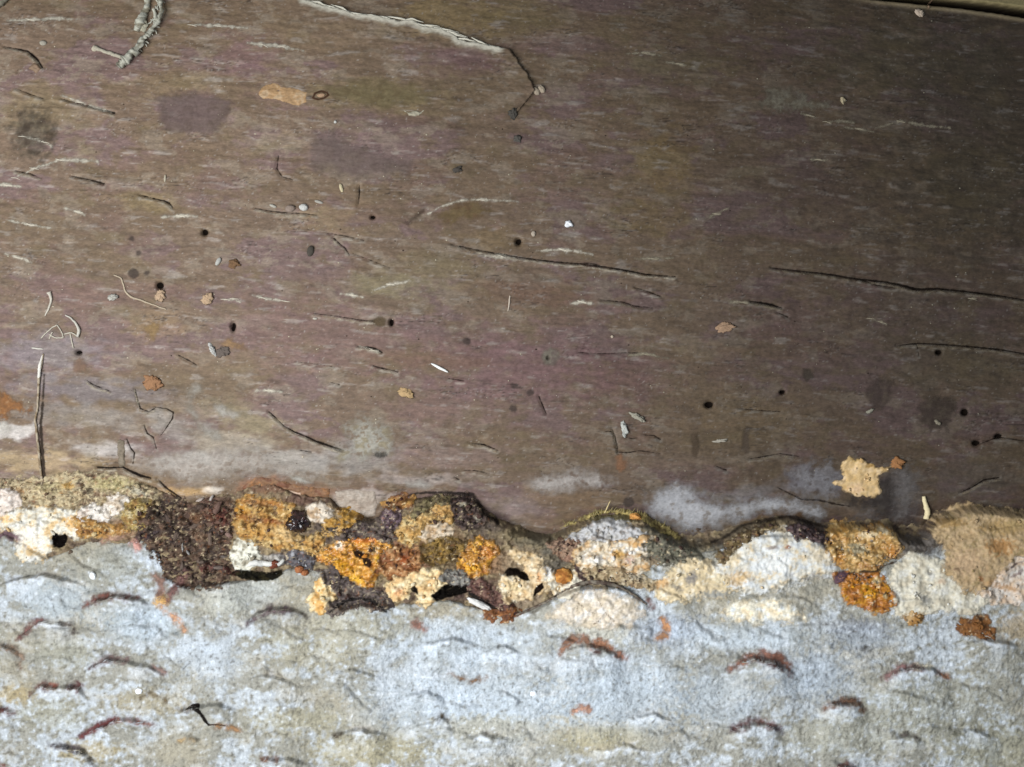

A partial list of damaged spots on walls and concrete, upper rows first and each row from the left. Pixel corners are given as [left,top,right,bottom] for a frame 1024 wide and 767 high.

crack [451,244,675,309]
crack [774,268,1024,302]
peeling [243,477,387,540]
spalling [433,490,491,549]
water stain [651,484,821,546]
spalling [50,530,67,548]
spalling [133,492,285,591]
spalling [354,548,372,568]
spalling [768,522,844,554]
spalling [410,582,480,601]
spalling [501,564,544,597]